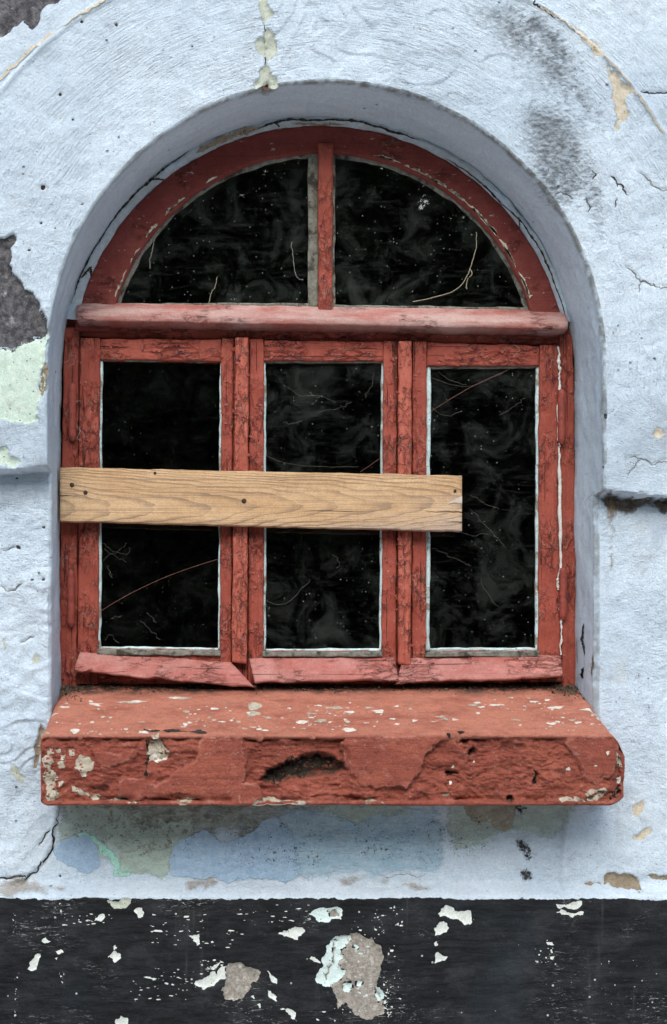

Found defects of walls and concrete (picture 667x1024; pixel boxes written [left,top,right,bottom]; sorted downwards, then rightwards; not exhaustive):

flaking render [0,0,105,80]
water stain [492,16,581,96]
water stain [528,109,591,202]
crack [547,170,666,212]
crack [626,267,667,292]
flaking render [0,235,49,424]
crack [0,812,59,885]
peeling [28,937,63,971]
peeling [59,898,296,1019]
peeling [271,907,343,940]
peeling [310,906,403,1021]
peeling [434,905,474,963]